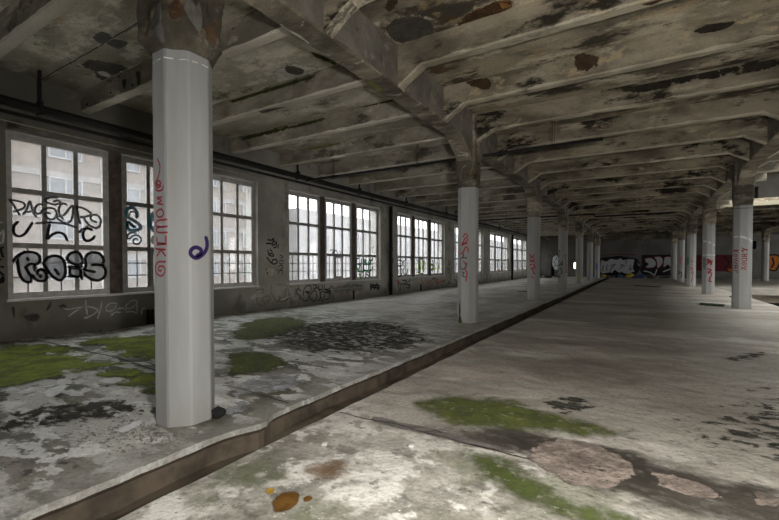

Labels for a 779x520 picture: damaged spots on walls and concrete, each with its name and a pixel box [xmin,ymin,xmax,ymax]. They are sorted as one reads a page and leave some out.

spalling [152,0,202,43]
corrosion [575,53,599,71]
spalling [274,63,324,82]